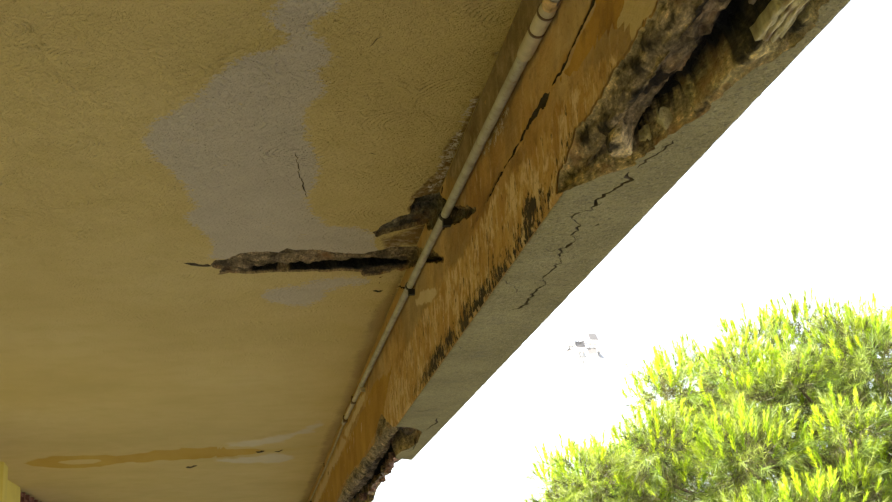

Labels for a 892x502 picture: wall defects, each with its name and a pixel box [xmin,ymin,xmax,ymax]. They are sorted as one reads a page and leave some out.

leakage [403,0,568,215]
crack [487,0,595,201]
leakage [16,270,406,502]
leakage [375,224,425,250]
corrosion [310,0,624,501]
peeling [130,0,829,502]
leakage [414,176,555,398]
crack [504,141,674,311]